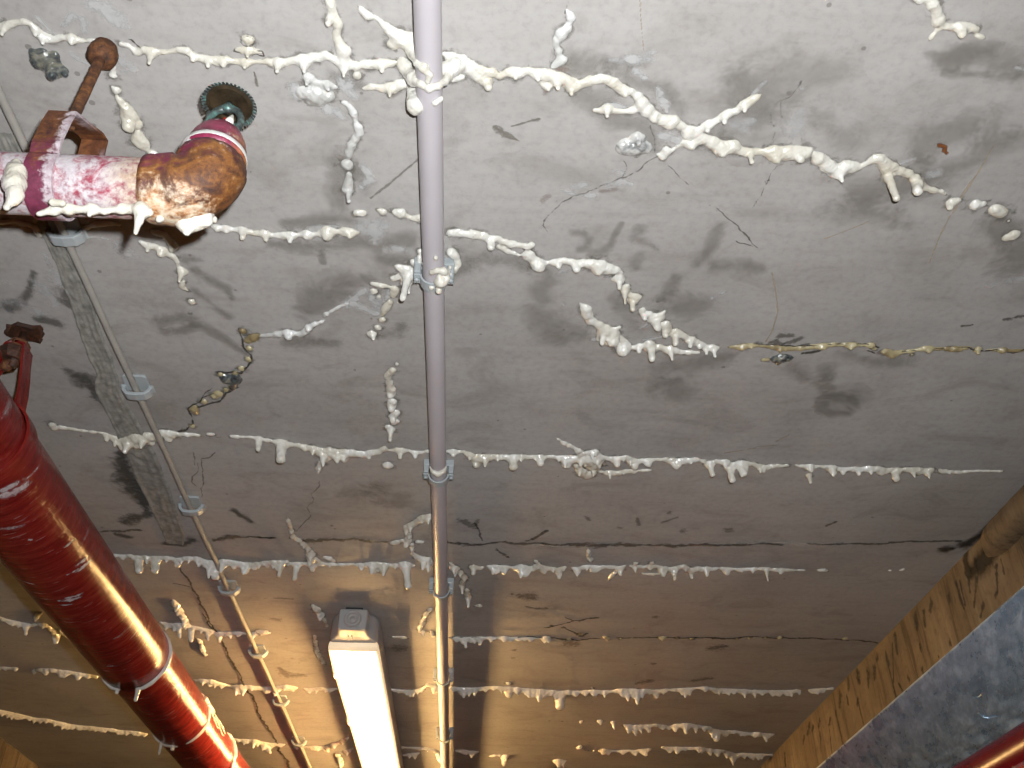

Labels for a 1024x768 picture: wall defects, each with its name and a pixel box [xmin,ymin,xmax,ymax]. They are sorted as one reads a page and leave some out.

water stain [0,0,1021,314]
crack [766,324,1024,354]
crack [178,328,252,495]
water stain [48,227,1024,538]
water stain [113,513,434,590]
crack [213,484,387,543]
crack [447,523,783,558]
water stain [449,549,829,608]
crack [808,521,962,545]
crack [173,568,290,768]
water stain [391,633,910,752]
water stain [576,720,786,767]